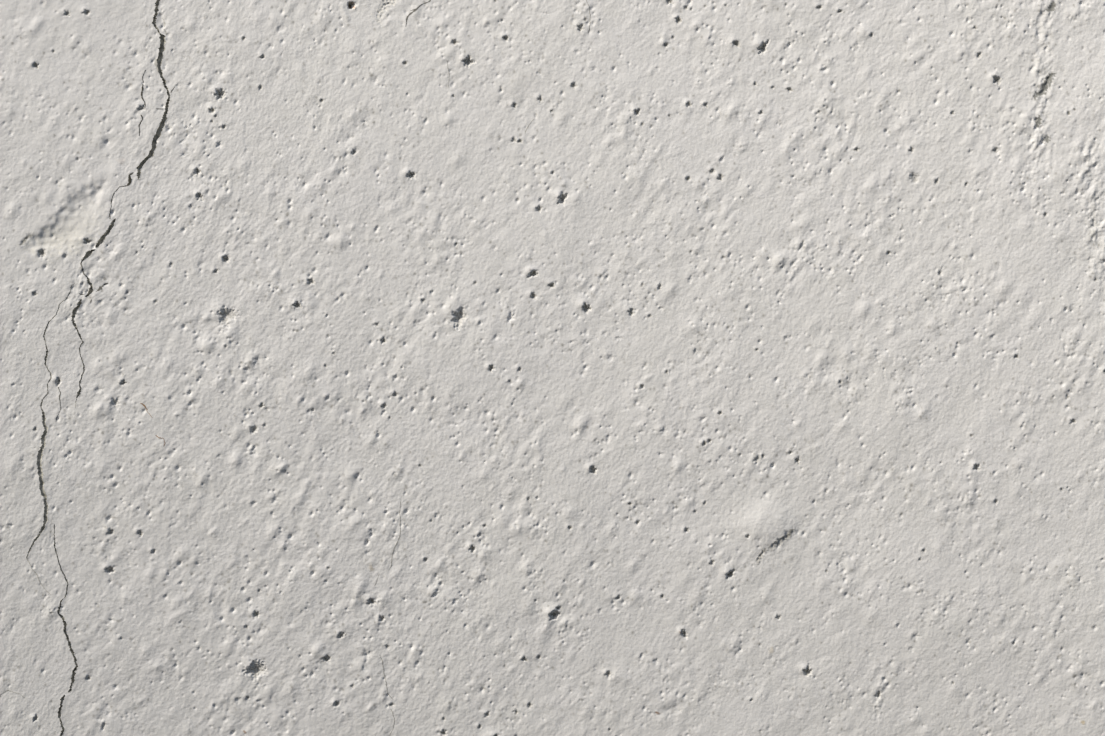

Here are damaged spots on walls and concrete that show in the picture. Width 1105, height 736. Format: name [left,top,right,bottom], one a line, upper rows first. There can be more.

crack [26,0,174,736]